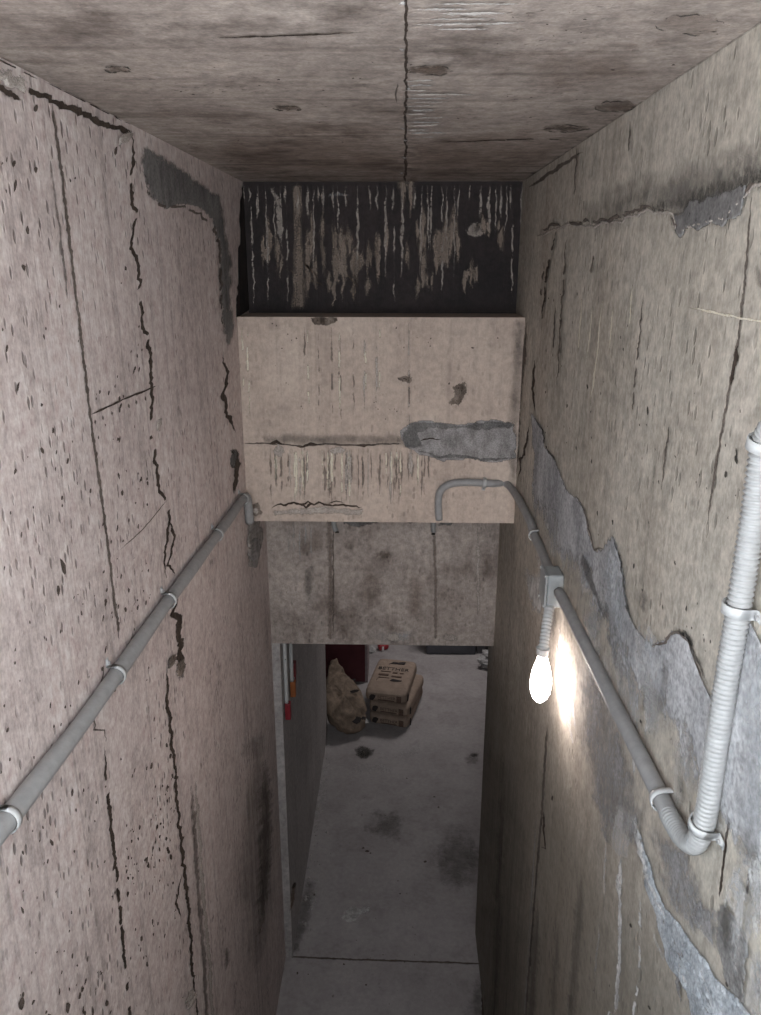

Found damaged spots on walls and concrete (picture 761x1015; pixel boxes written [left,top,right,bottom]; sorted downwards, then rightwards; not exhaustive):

crack [395,0,410,182]
crack [0,59,176,578]
water stain [243,186,523,298]
crack [272,500,363,515]
crack [165,599,199,1015]